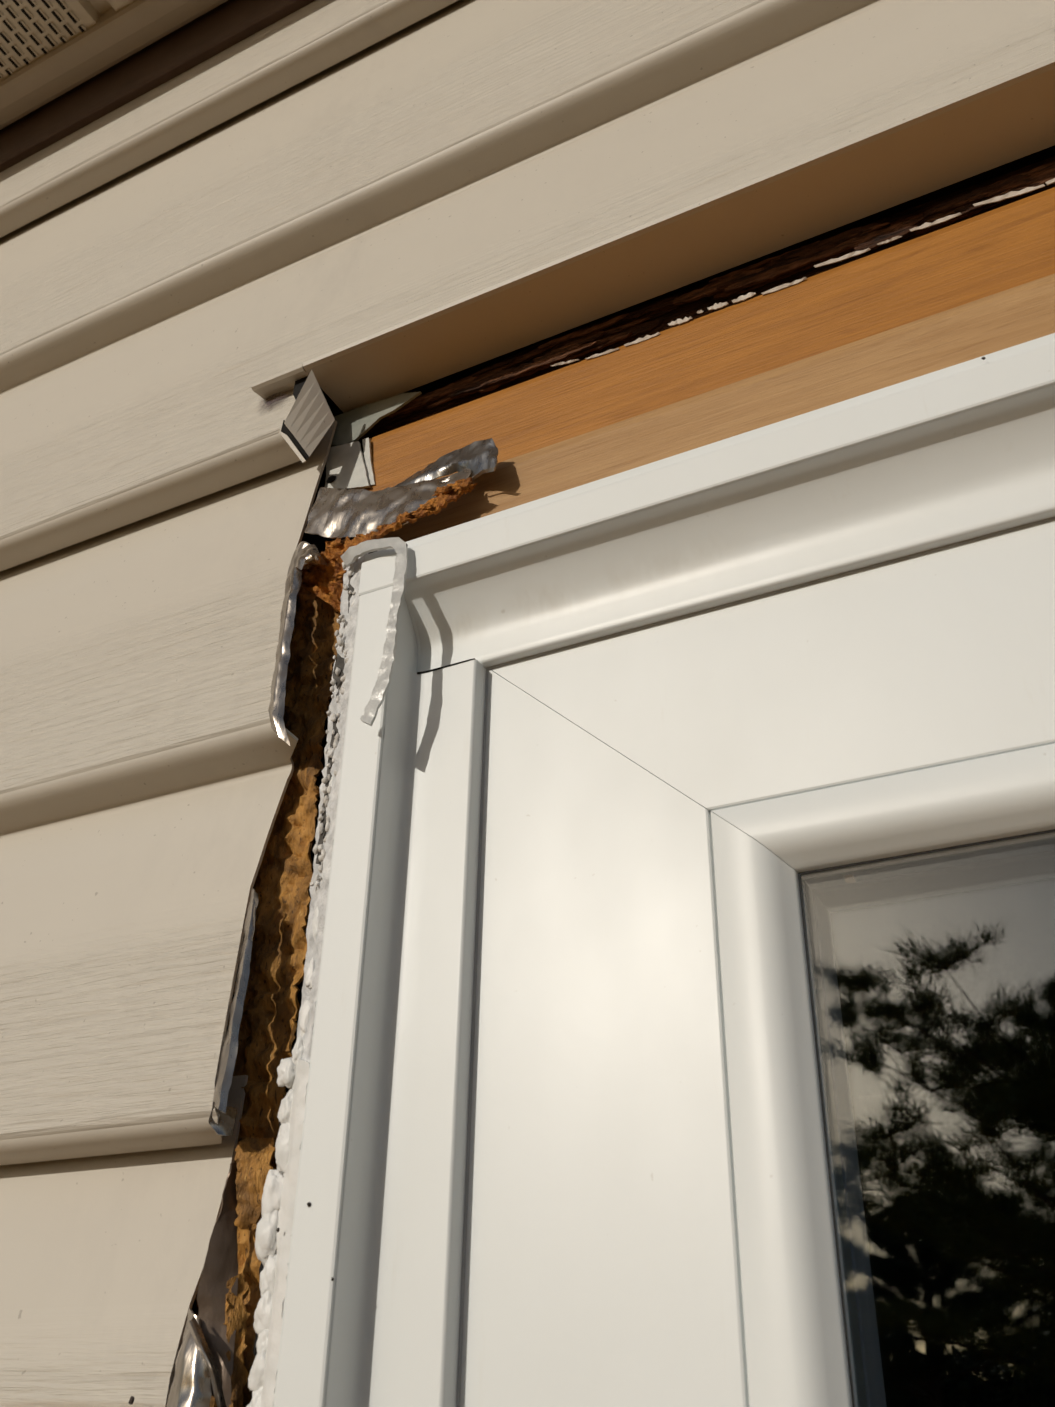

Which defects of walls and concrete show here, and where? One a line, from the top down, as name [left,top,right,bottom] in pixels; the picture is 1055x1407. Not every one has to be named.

peeling [341,537,408,726]